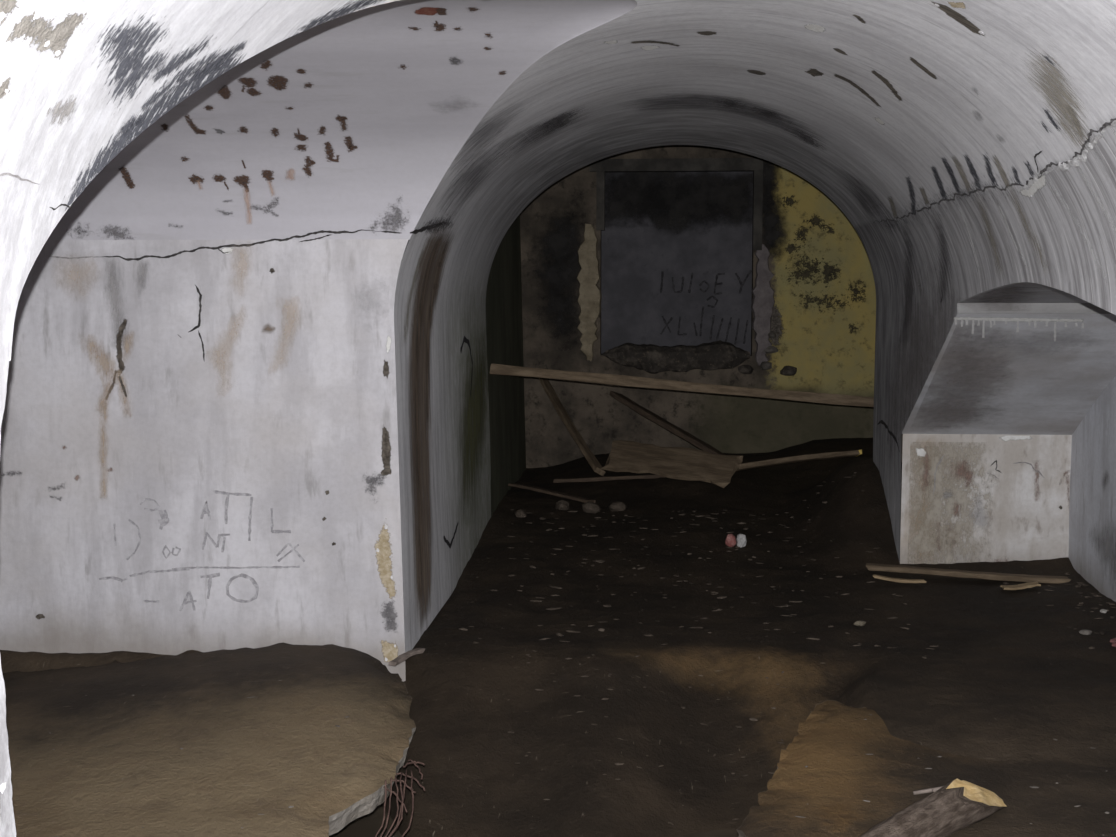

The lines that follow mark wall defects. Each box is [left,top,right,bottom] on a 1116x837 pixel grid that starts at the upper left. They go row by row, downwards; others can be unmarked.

peeling [0,0,87,60]
peeling [0,77,11,98]
water stain [64,12,247,209]
corrosion [203,60,312,111]
corrosion [119,166,135,189]
corrosion [188,160,274,221]
corrosion [288,115,357,179]
crack [875,118,1116,222]
crack [49,222,446,261]
water stain [785,214,866,315]
spalling [375,524,396,599]
spalling [328,728,416,836]